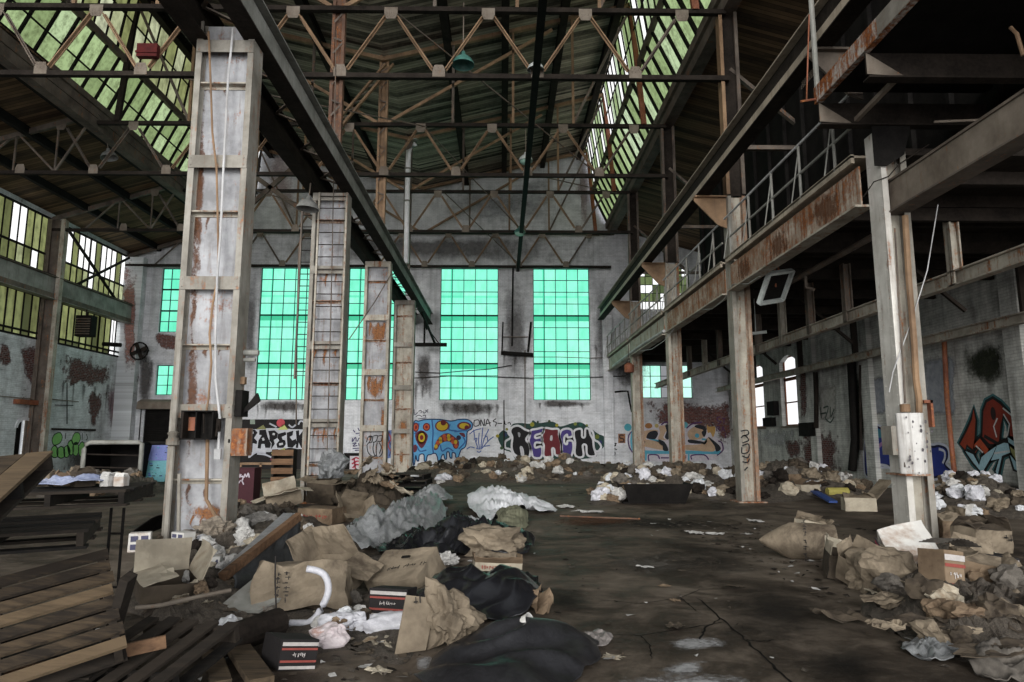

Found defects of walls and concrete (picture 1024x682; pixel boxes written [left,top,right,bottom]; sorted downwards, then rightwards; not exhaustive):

rust [191,168,210,276]
rust [813,189,837,226]
rust [187,289,220,404]
rust [369,322,386,340]
leakage [965,345,1002,383]
flaking render [60,355,110,426]
rust [367,376,384,396]
flaking render [647,401,668,424]
flaking render [684,403,731,442]
crack [608,588,792,682]